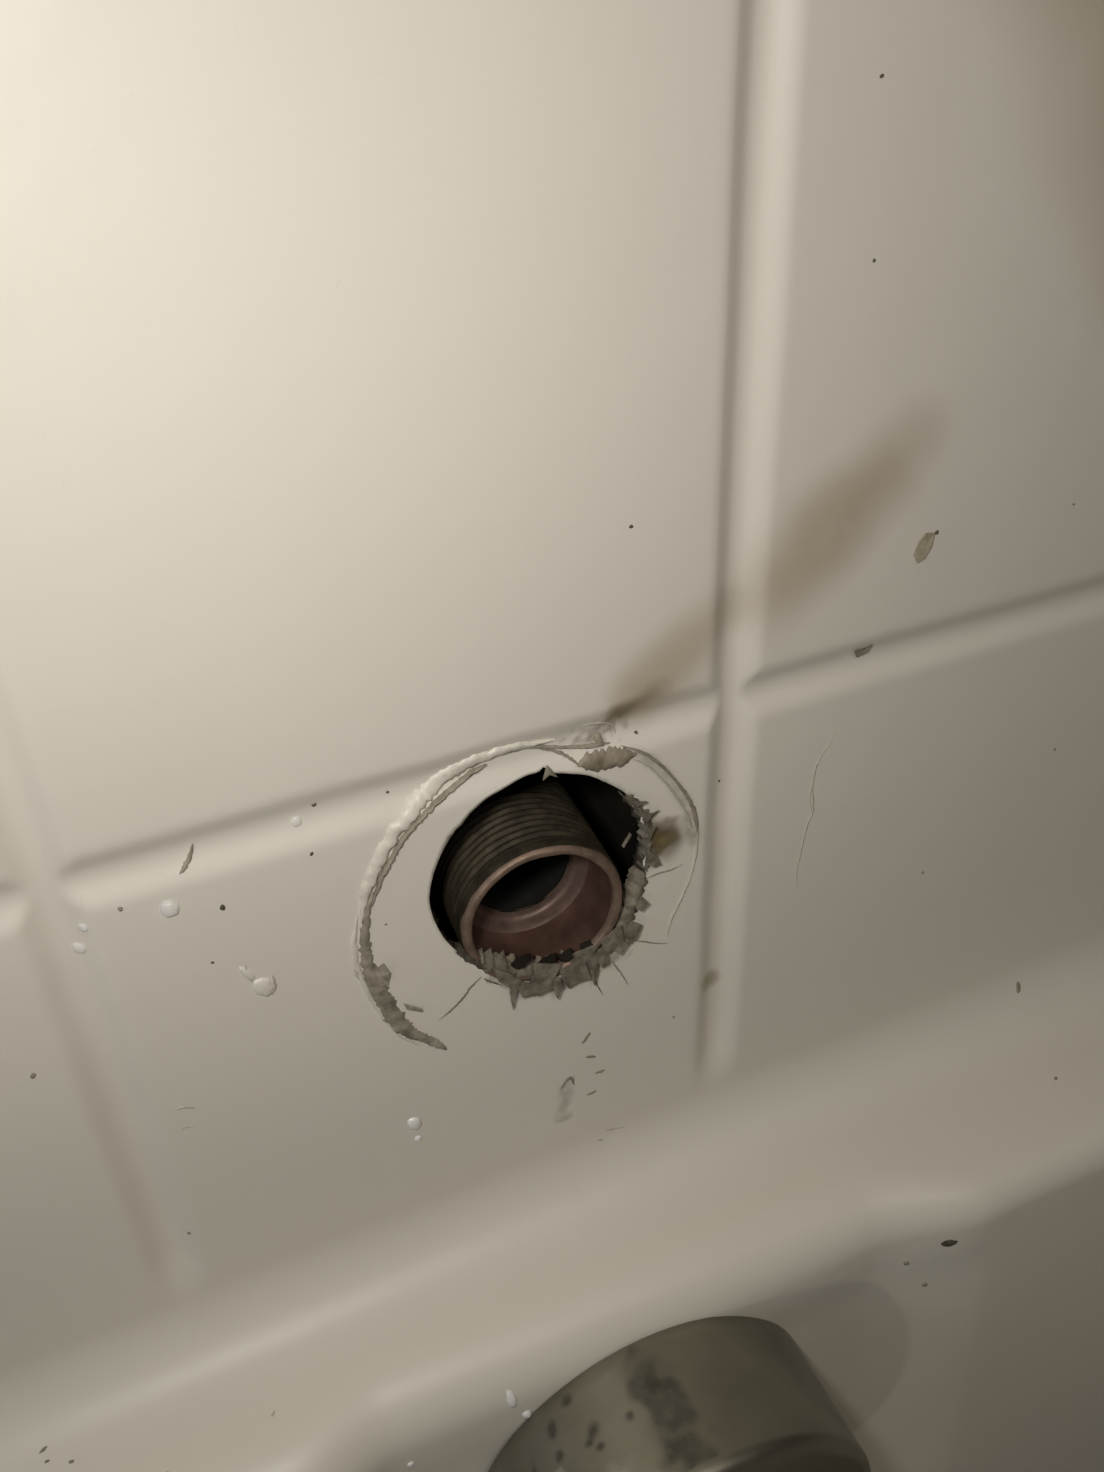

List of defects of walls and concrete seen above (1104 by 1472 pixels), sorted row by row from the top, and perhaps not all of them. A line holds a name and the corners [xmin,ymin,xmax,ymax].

crack [647,864,683,879]
spalling [453,791,661,1008]
crack [596,940,668,995]
crack [439,977,514,1020]